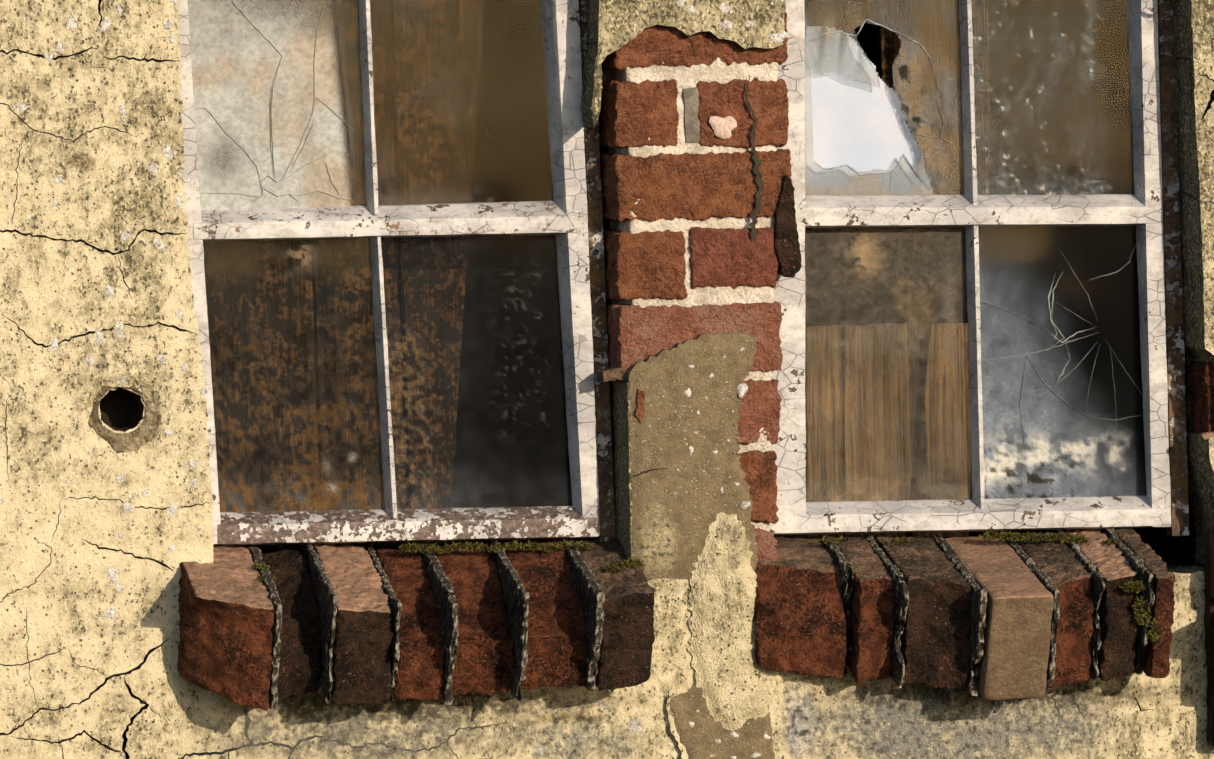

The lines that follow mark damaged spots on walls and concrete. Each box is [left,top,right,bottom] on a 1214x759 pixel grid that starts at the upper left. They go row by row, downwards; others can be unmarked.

crack [0,0,180,68]
crack [0,103,198,348]
crack [0,374,9,481]
spalling [580,12,802,731]
crack [0,496,208,759]
crack [180,707,505,759]